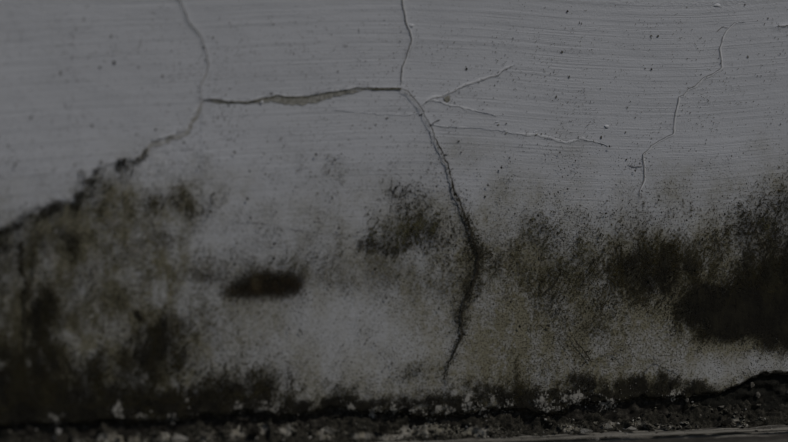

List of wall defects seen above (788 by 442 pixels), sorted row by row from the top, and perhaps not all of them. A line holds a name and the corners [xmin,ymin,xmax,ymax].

crack [177,0,209,100]
crack [628,22,743,203]
crack [401,0,515,386]
damp [0,80,788,427]
spalling [339,390,513,419]
spalling [529,386,644,413]
spalling [655,370,788,417]